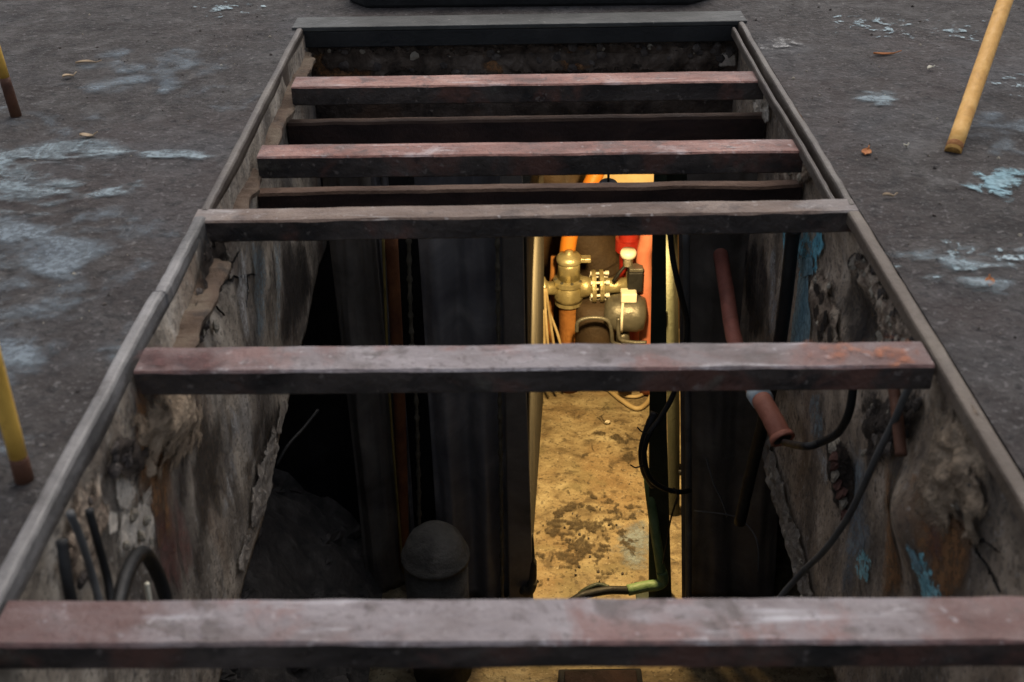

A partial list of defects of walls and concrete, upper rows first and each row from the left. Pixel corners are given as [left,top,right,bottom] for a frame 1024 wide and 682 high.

spalling [199,319,220,343]
spalling [195,239,233,305]
crack [216,251,256,316]
spalling [808,268,839,343]
spalling [847,250,915,342]
spalling [239,400,288,573]